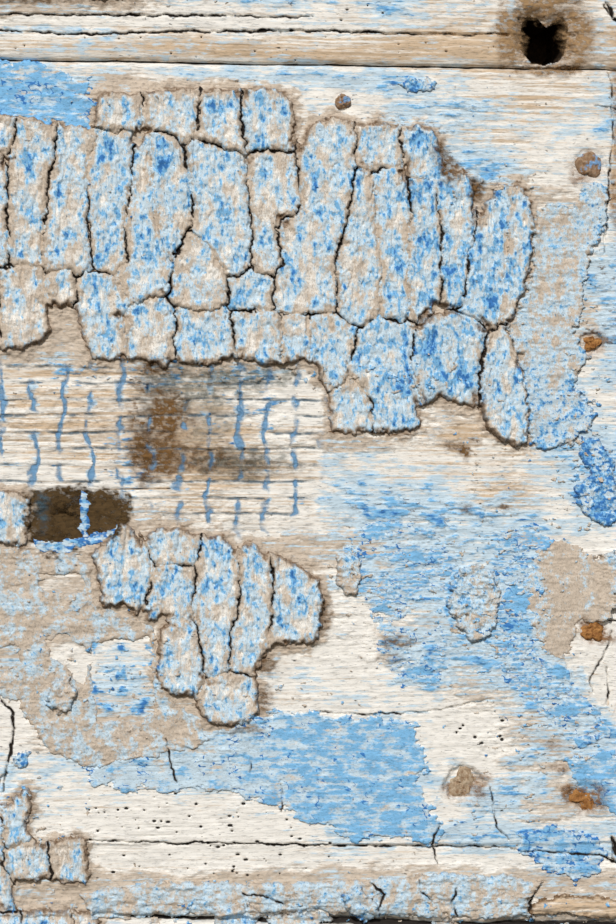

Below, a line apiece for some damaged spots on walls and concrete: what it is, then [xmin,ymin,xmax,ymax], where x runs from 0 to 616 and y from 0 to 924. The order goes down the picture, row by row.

water stain [496,0,593,75]
crack [604,5,616,22]
peeling [0,58,616,526]
crack [0,87,508,605]
water stain [129,386,266,481]
crack [195,563,252,679]
peeling [0,490,452,847]
crack [268,558,276,628]
crack [0,700,15,791]
rust [562,785,602,807]
peeling [0,787,102,924]
peeling [340,886,380,923]